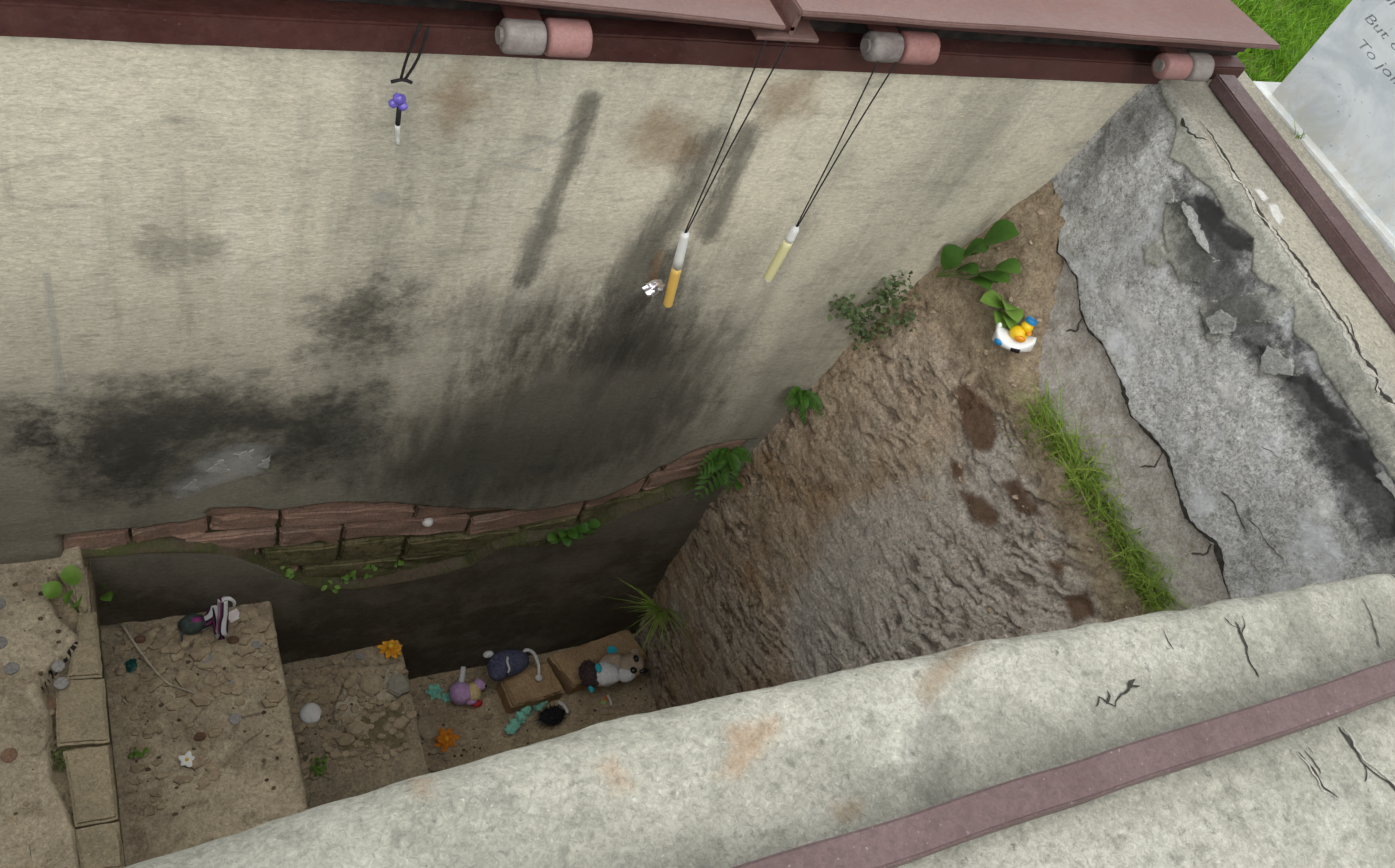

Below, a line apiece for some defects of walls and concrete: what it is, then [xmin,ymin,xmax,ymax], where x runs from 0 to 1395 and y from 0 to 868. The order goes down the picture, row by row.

spalling [1162,189,1210,253]
crack [1180,118,1395,411]
spalling [1206,310,1238,334]
spalling [1260,346,1295,376]
leakage [70,392,355,497]
crack [1053,190,1284,677]
spalling [63,440,745,577]
crack [40,641,78,690]
crack [1096,679,1140,707]
crack [1297,726,1395,800]